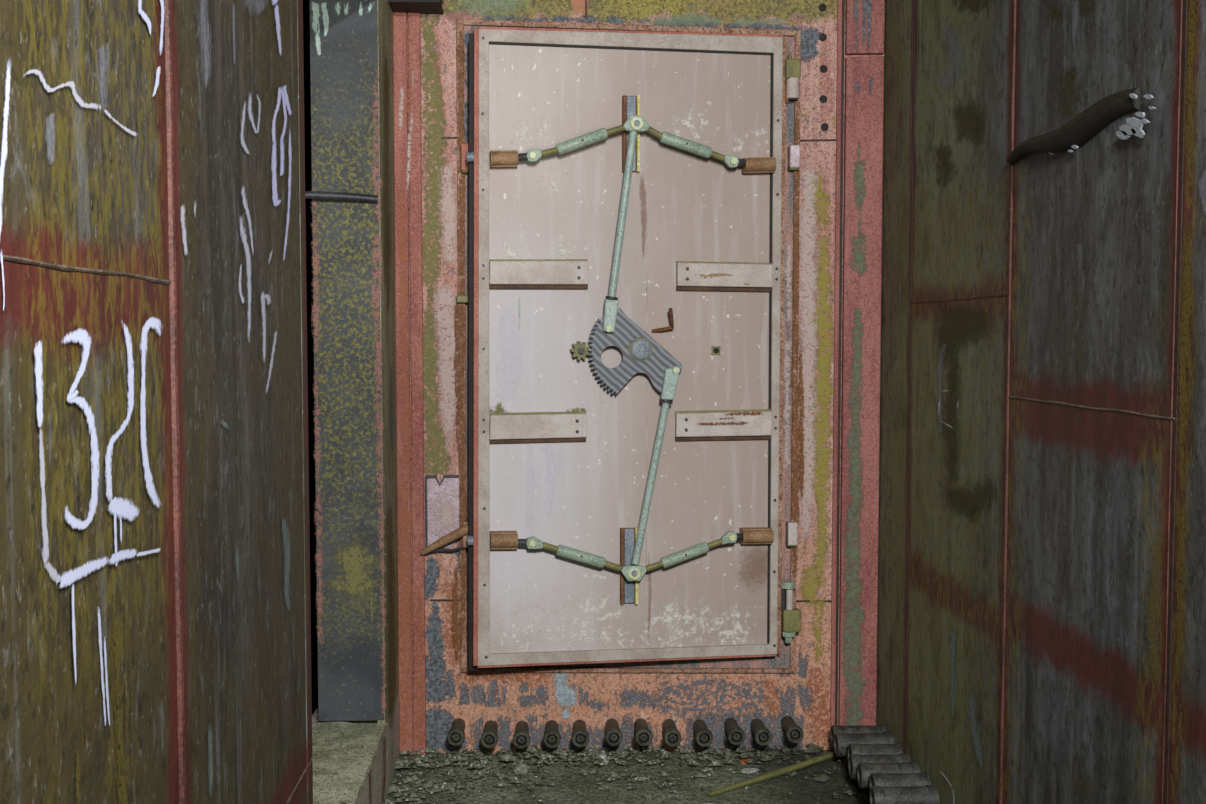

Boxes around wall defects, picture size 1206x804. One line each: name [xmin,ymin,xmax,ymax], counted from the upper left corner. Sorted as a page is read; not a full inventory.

rust [791,170,805,527]
peeling [425,551,830,754]